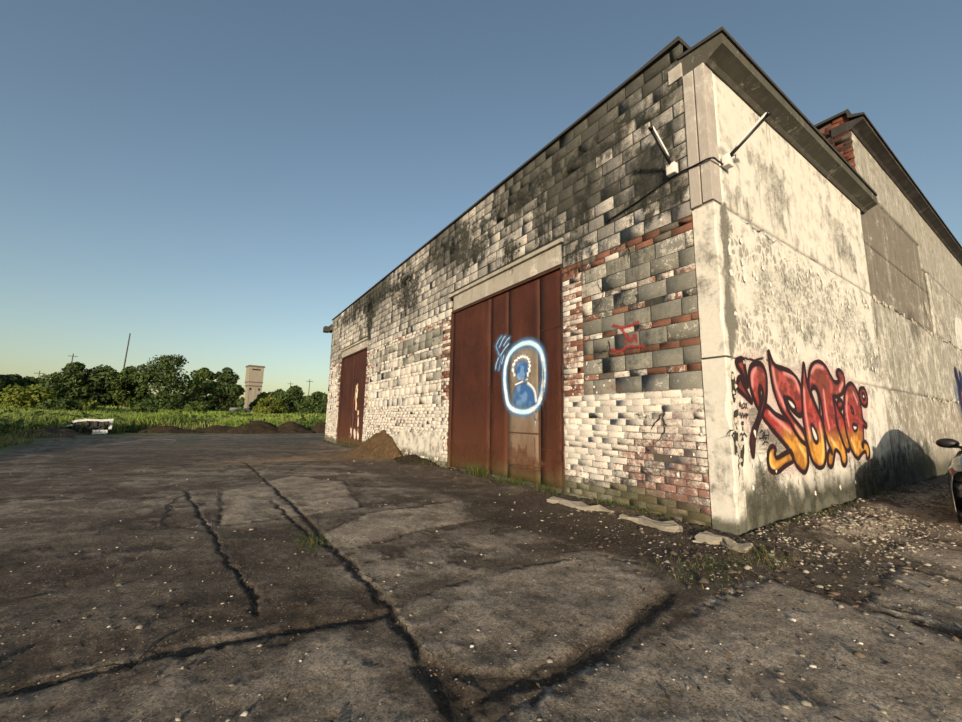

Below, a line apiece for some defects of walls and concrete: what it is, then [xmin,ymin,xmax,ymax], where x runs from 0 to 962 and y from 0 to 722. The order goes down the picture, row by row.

mould [336,92,689,340]
peeling [720,202,962,473]
crack [0,466,668,700]
leakage [743,400,934,527]